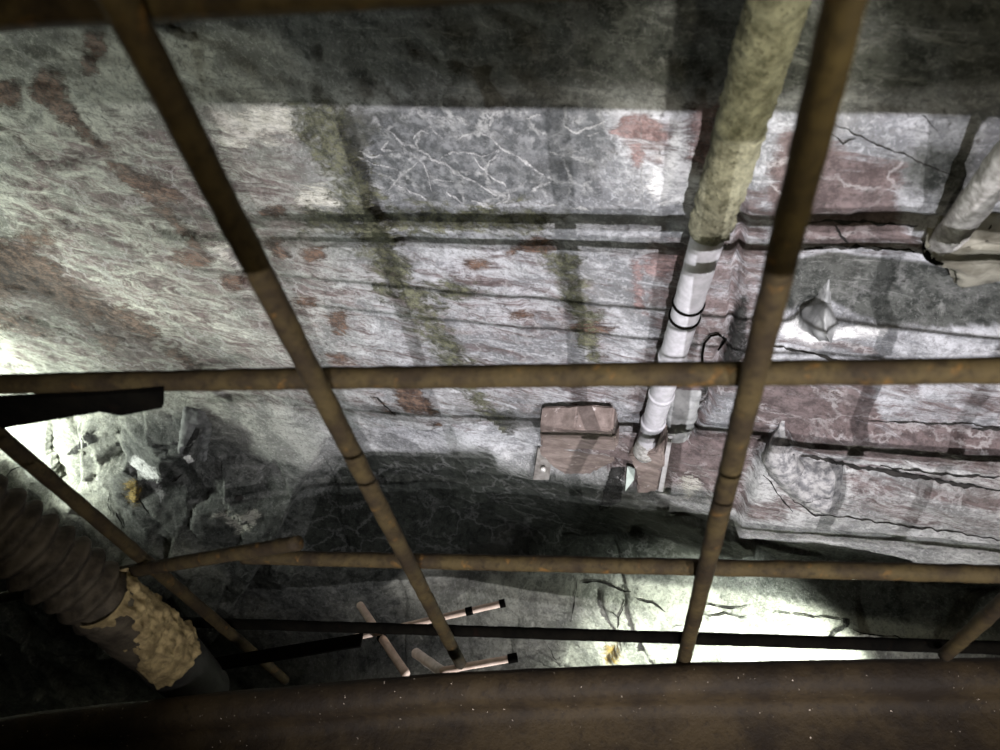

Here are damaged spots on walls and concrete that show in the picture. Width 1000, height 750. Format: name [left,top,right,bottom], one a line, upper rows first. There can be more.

rust [609,114,672,167]
crack [834,125,955,176]
water stain [202,238,236,265]
water stain [210,97,568,365]
water stain [543,249,605,363]
water stain [454,388,518,436]
crack [793,454,1000,491]
crack [763,475,1000,541]
crack [570,578,747,628]
crack [776,612,900,638]